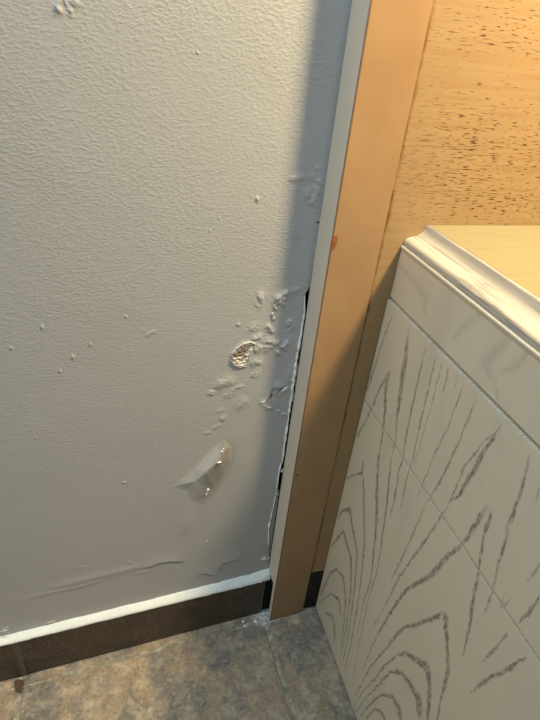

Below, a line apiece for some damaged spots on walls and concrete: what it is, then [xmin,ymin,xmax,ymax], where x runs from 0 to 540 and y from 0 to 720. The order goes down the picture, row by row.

spalling [228,340,257,370]
crack [261,297,305,560]